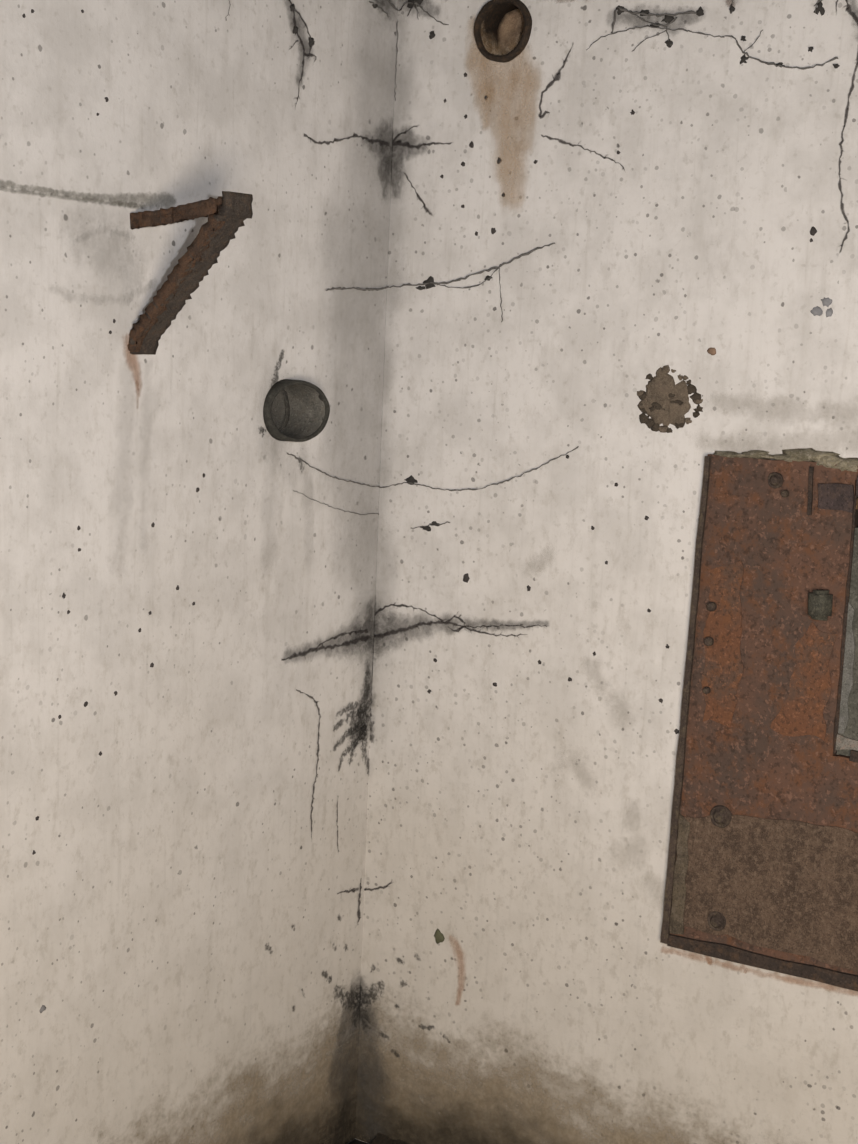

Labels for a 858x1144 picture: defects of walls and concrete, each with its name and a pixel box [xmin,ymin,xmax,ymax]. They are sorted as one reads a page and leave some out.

crack [289,0,317,107]
crack [304,126,452,215]
crack [539,49,624,169]
crack [836,0,858,24]
crack [838,53,858,252]
rust [127,214,225,352]
spalling [637,365,703,433]
crack [282,604,546,661]
crack [297,690,338,846]
water stain [137,965,688,1144]